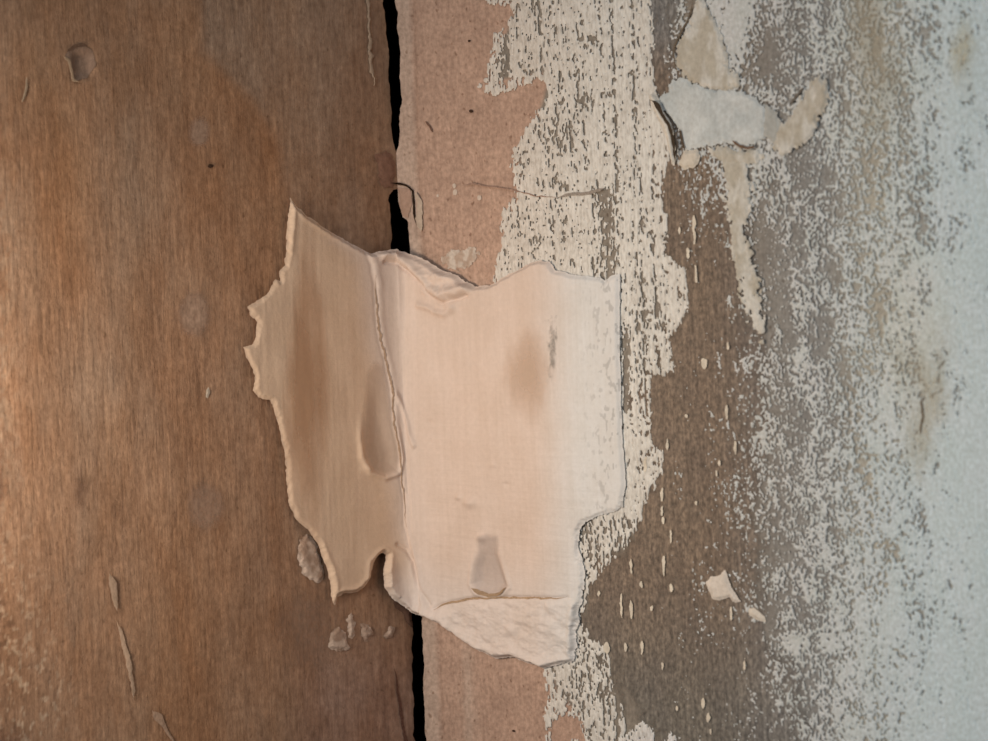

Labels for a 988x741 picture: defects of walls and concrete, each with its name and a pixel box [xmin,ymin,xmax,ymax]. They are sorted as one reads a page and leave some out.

peeling [63,43,96,82]
crack [374,0,416,254]
spalling [415,192,423,232]
crack [375,288,405,517]
peeling [477,0,988,741]
spalling [471,587,506,597]
crack [392,599,427,741]